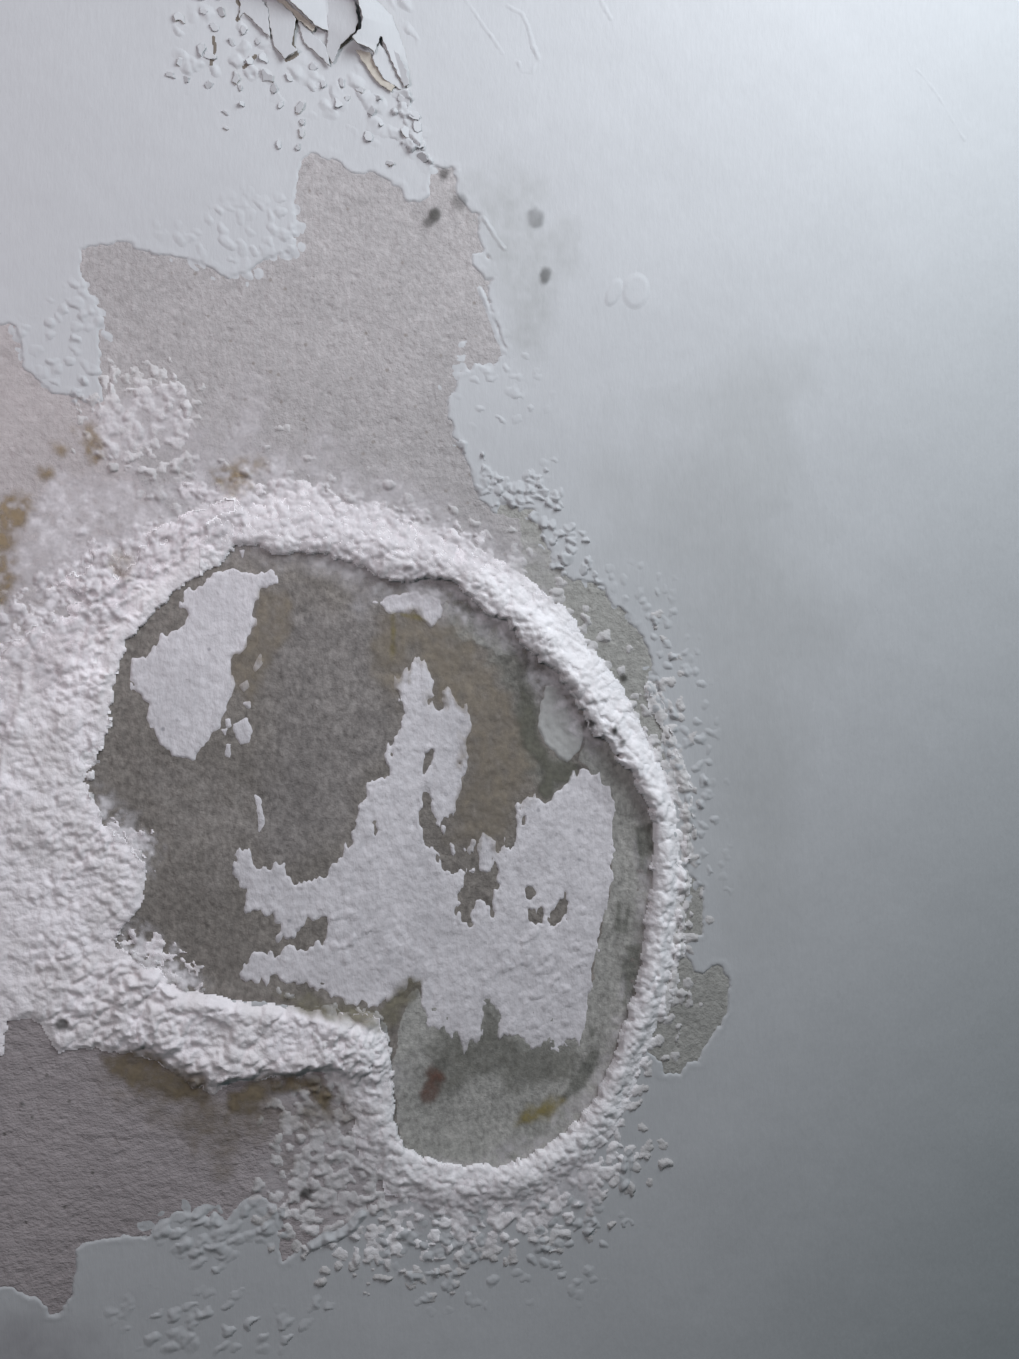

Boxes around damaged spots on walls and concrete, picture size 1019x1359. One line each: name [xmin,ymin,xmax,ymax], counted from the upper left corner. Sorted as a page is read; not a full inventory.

flaking render [0,0,666,770]
flaking render [0,1019,396,1315]
peeling [83,544,606,1065]
damp [0,356,714,1303]
flaking render [648,877,729,1074]